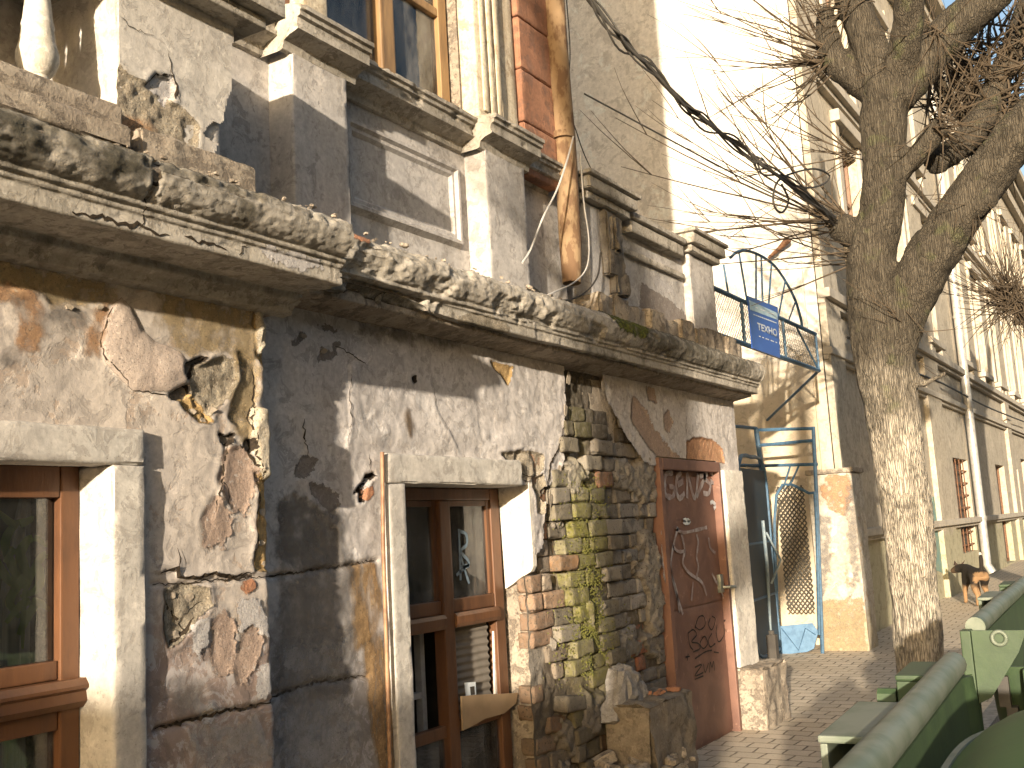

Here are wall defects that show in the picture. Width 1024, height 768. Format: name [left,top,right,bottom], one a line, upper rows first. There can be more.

spalling [116,64,200,147]
crack [72,164,249,255]
crack [100,307,132,390]
spalling [169,348,341,572]
spalling [353,454,377,502]
spalling [501,450,553,515]
crack [153,548,376,586]
peeling [164,581,272,701]